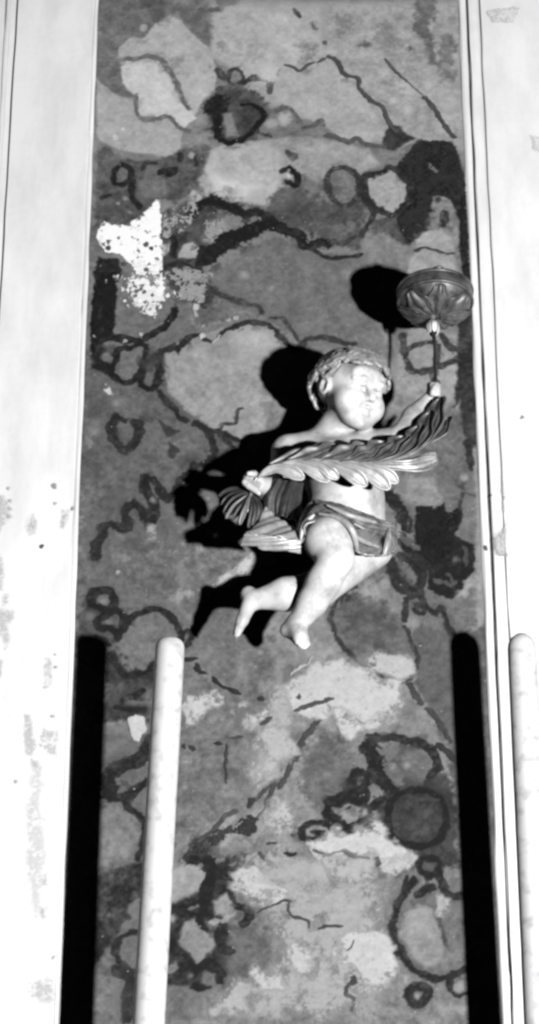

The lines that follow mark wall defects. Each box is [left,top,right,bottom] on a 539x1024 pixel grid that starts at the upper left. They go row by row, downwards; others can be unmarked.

peeling [96,199,226,343]